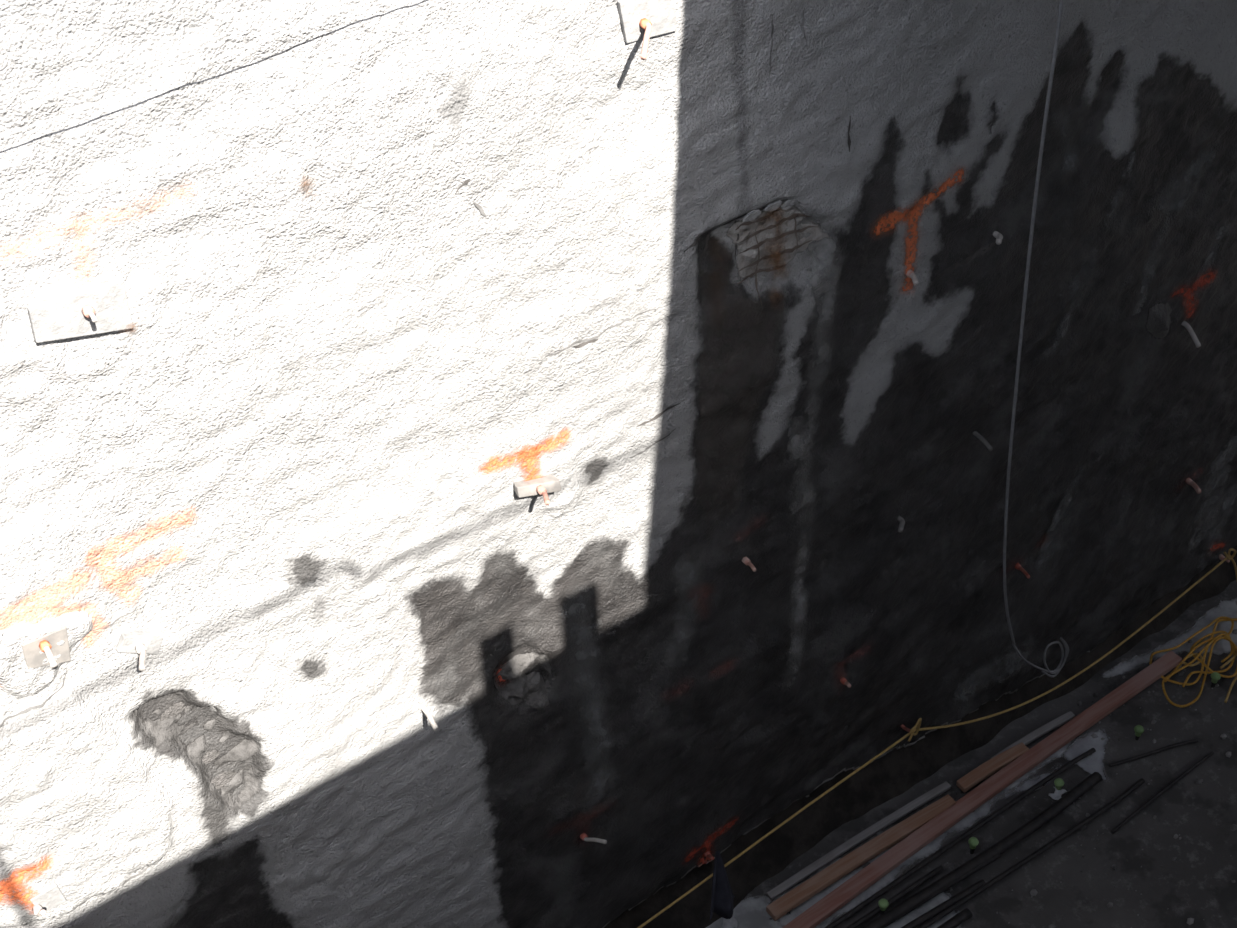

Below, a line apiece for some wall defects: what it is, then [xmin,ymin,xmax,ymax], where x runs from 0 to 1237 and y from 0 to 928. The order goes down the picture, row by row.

spalling [727,199,829,304]
damp [409,21,1237,928]
spalling [493,644,553,706]
spalling [130,691,261,808]
damp [133,689,293,928]